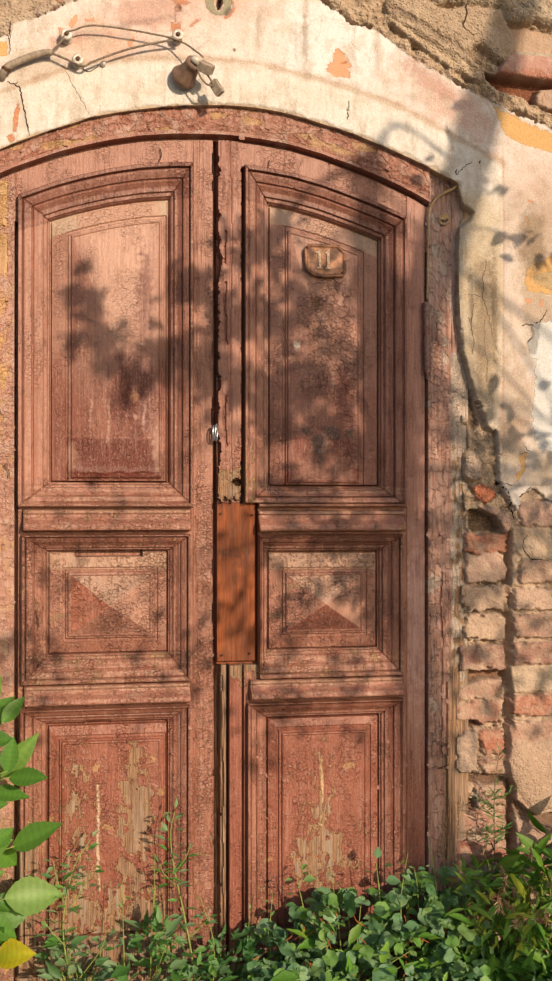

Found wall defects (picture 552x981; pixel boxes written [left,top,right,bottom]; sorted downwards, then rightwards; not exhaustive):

spalling [0,0,76,56]
peeling [58,15,95,36]
peeling [326,48,352,78]
crack [7,81,30,134]
peeling [524,256,552,307]
spalling [461,399,515,535]